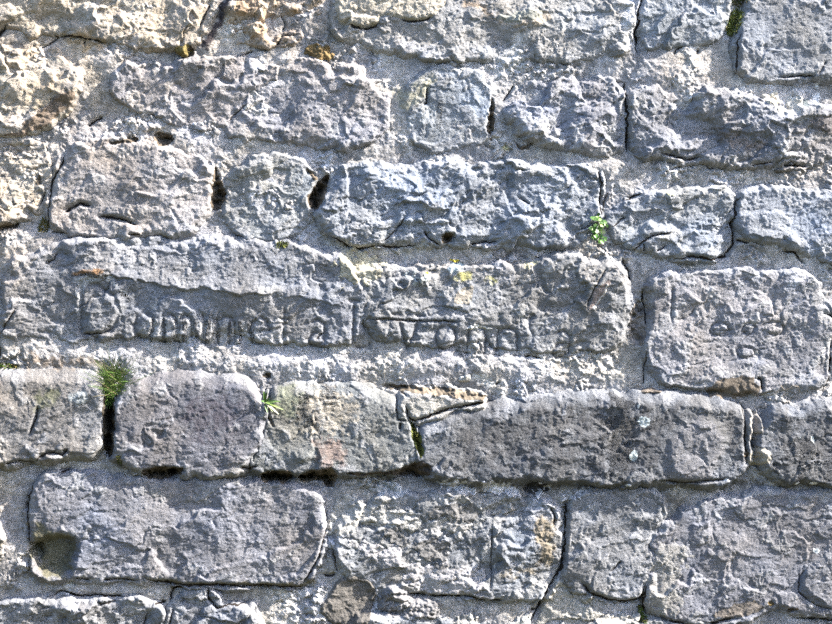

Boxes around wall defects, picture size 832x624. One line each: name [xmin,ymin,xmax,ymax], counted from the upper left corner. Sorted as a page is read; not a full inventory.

crack [396,382,500,428]
crack [530,501,568,621]